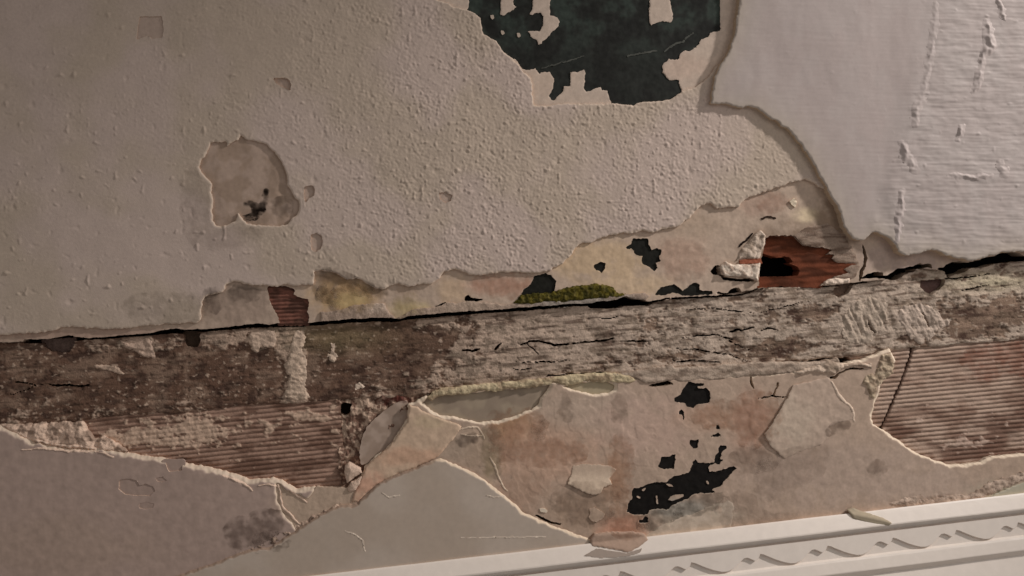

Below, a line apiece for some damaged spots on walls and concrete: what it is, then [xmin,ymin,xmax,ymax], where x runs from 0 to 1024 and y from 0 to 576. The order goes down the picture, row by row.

peeling [438,0,737,106]
spalling [199,136,315,226]
crack [31,287,793,377]
spalling [320,273,714,321]
peeling [626,238,661,271]
spalling [716,230,766,283]
spalling [823,278,850,286]
peeling [276,385,549,526]
peeling [568,425,736,558]
peeling [674,382,710,419]
peeling [764,377,853,459]
peeling [889,472,1024,507]